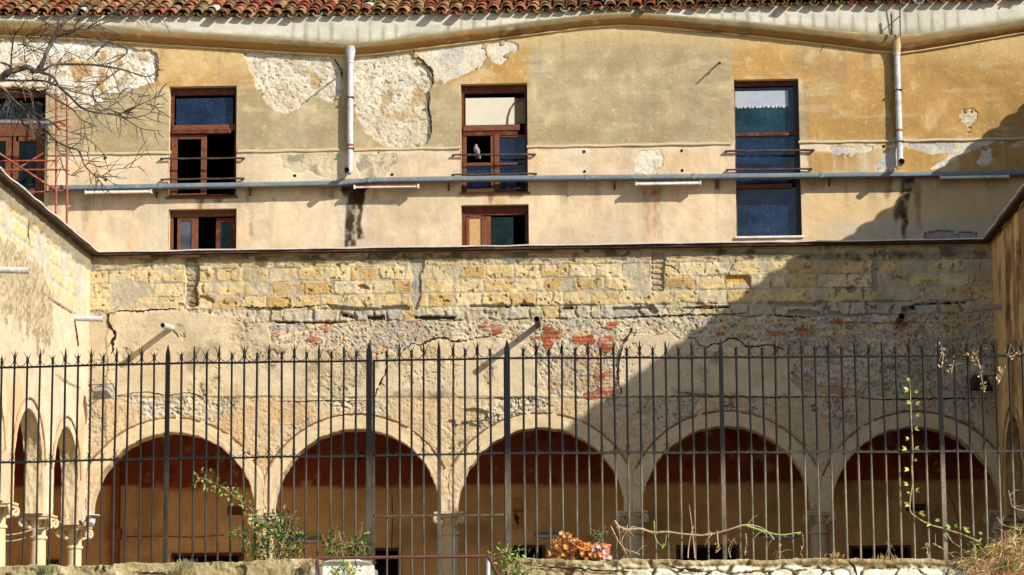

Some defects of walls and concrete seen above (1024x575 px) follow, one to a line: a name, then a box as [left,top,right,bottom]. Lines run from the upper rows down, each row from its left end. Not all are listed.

peeling [0,39,158,110]
peeling [244,40,518,179]
peeling [635,149,664,174]
peeling [874,108,996,171]
water stain [335,179,371,246]
water stain [895,178,914,235]
crack [107,308,179,354]
flaking render [480,320,503,334]
flaking render [531,322,618,352]
flaking render [582,369,621,399]